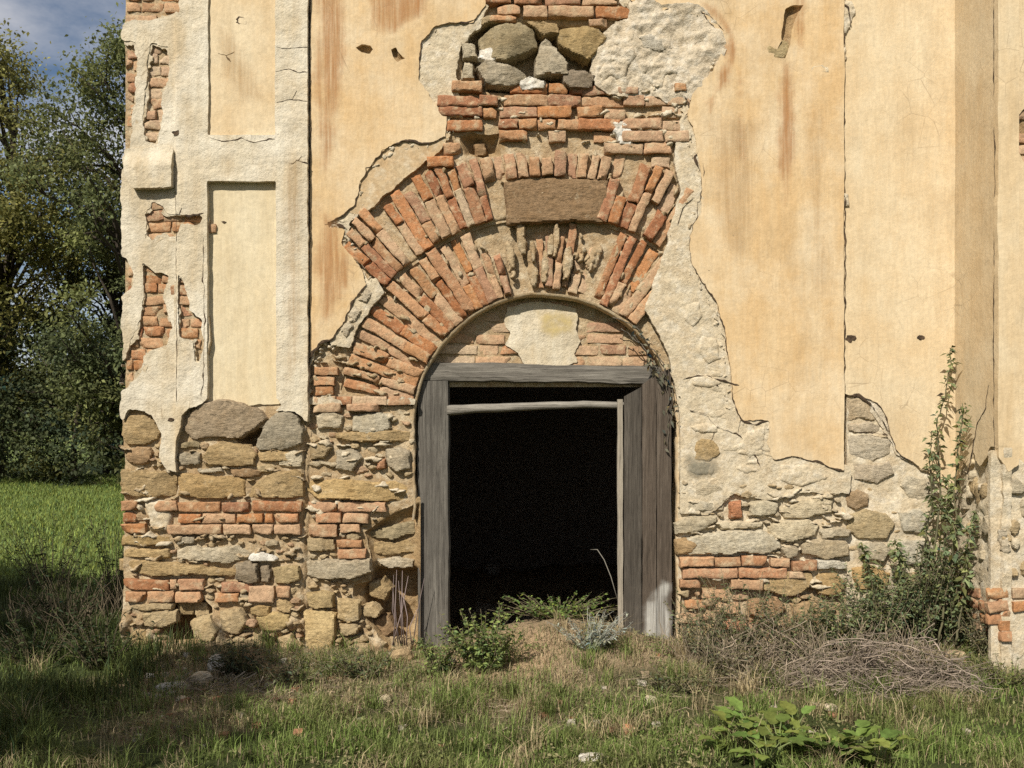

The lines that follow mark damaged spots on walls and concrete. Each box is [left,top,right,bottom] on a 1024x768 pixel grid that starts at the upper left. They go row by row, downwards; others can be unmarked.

flaking render [119,0,1024,672]